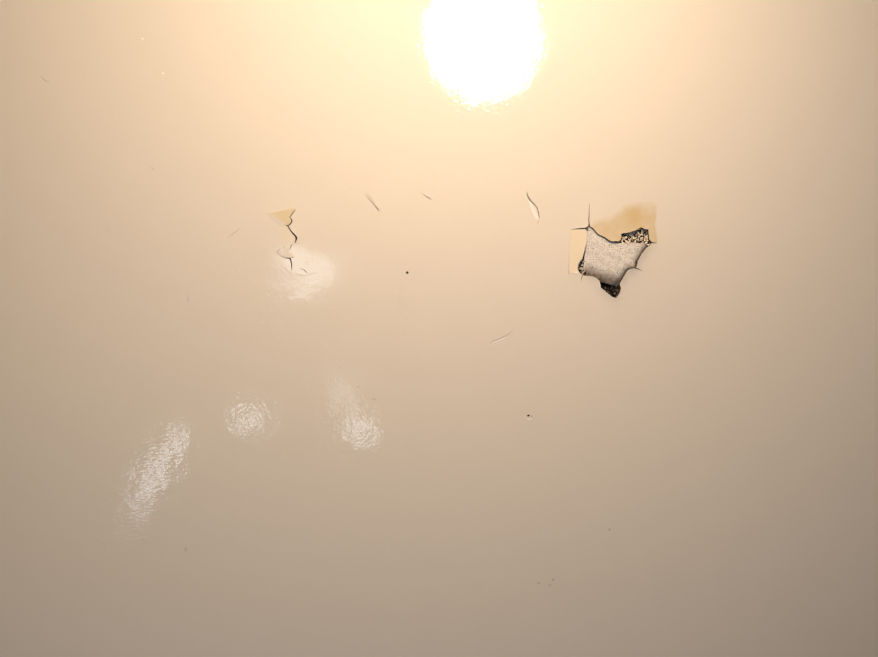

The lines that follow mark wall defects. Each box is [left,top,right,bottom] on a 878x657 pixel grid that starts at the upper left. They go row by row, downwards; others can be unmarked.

crack [265,208,314,276]
spalling [544,192,682,328]
water stain [589,201,658,244]